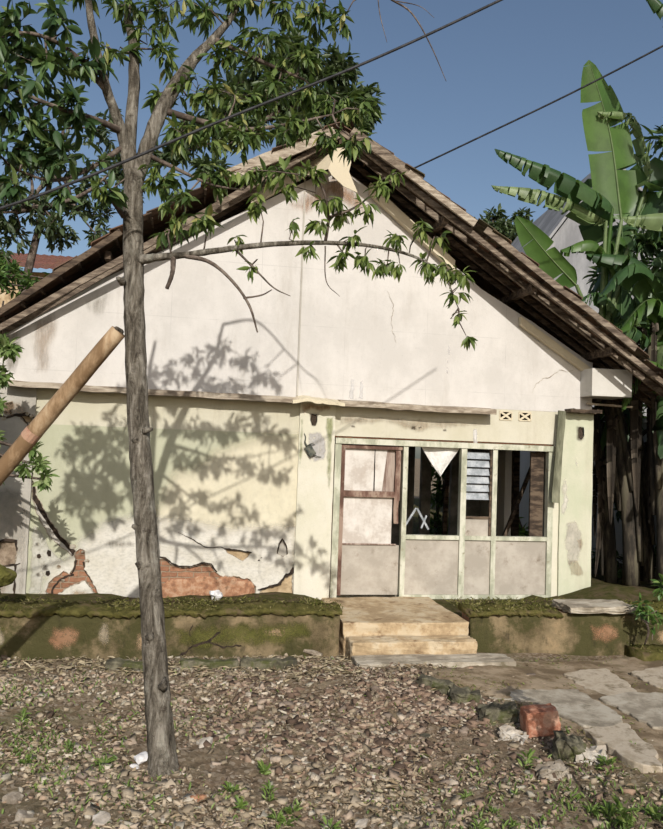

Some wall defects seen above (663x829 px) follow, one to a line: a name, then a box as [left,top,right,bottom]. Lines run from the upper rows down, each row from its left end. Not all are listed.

flaking render [29,527,64,593]
spalling [160,556,294,598]
peeling [224,548,252,561]
peeling [277,538,288,557]
peeling [566,522,581,562]
crack [180,625,241,656]